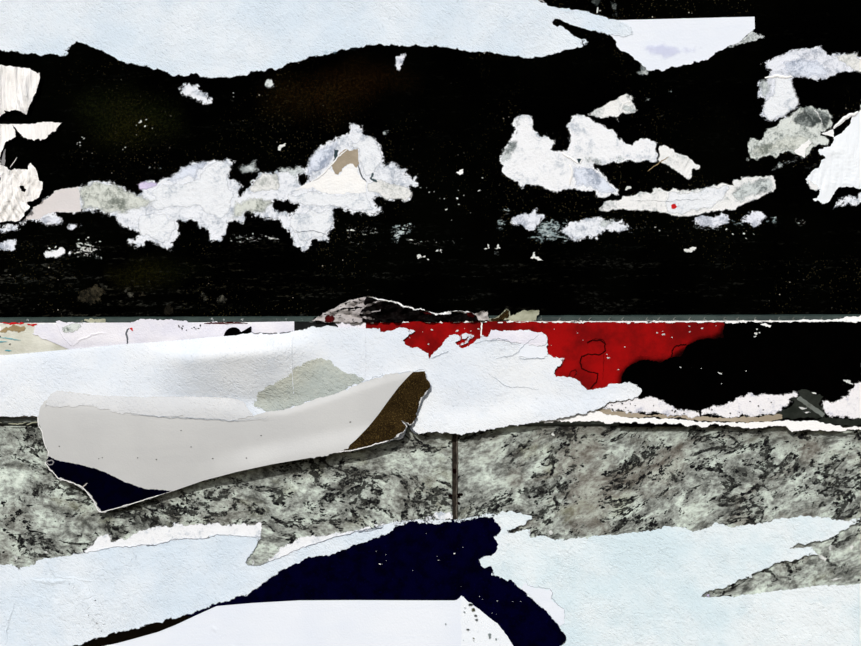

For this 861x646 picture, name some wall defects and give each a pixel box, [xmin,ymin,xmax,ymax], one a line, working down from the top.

peeling [531,219,566,243]
peeling [686,316,861,337]
peeling [778,389,861,427]